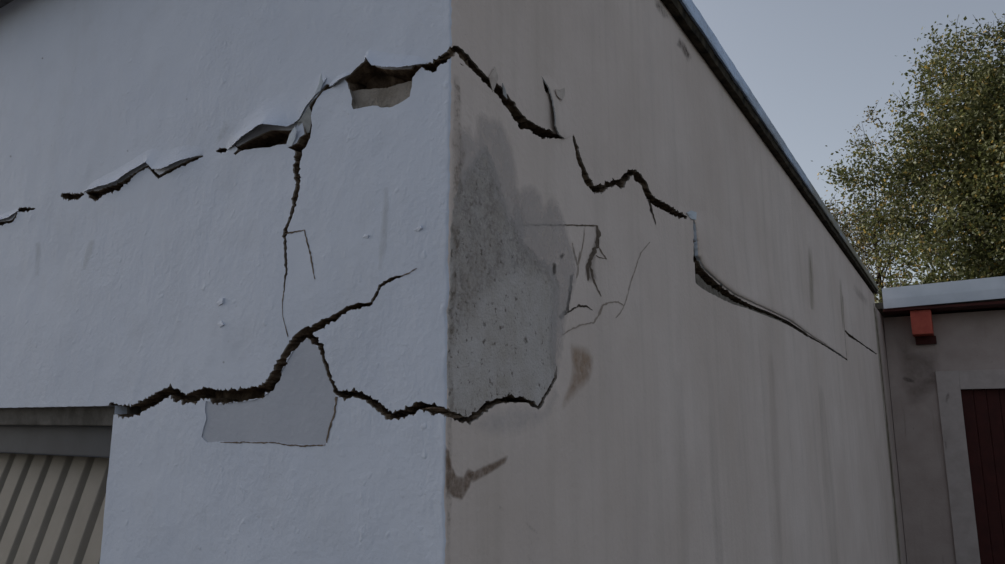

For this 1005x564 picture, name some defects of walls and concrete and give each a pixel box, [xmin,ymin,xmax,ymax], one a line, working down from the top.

crack [0,207,35,226]
peeling [202,338,336,445]
crack [61,73,557,447]
flaking render [345,60,417,109]
peeling [447,145,559,417]
crack [412,46,900,559]